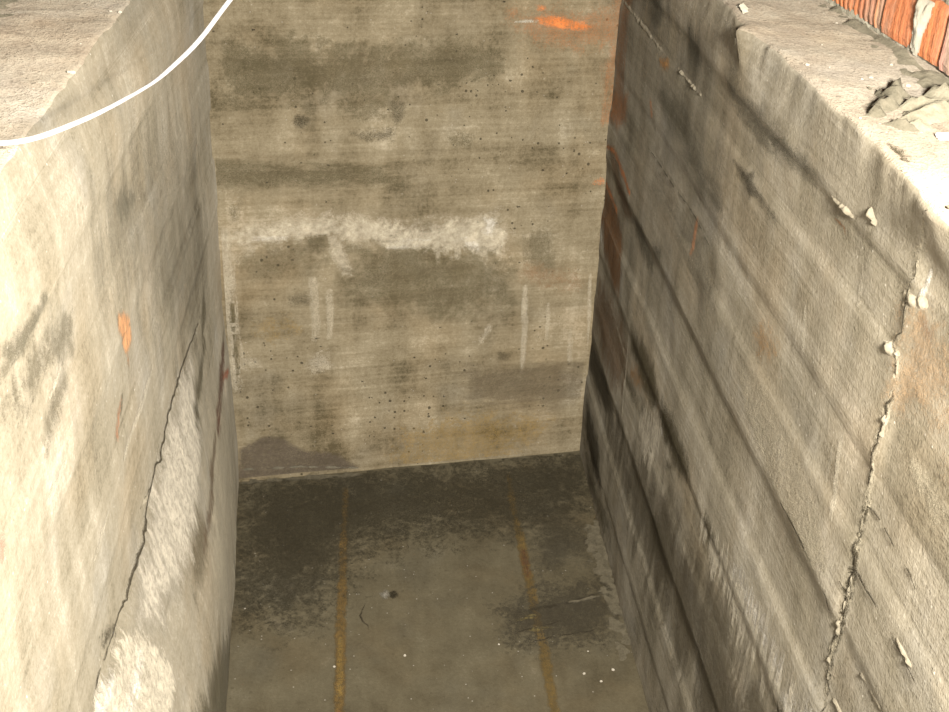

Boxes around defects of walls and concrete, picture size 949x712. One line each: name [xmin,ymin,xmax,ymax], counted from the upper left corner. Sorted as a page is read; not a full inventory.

rust [505,0,633,130]
leakage [0,290,76,458]
crack [94,325,198,694]
leakage [86,0,830,712]
crack [820,209,933,712]